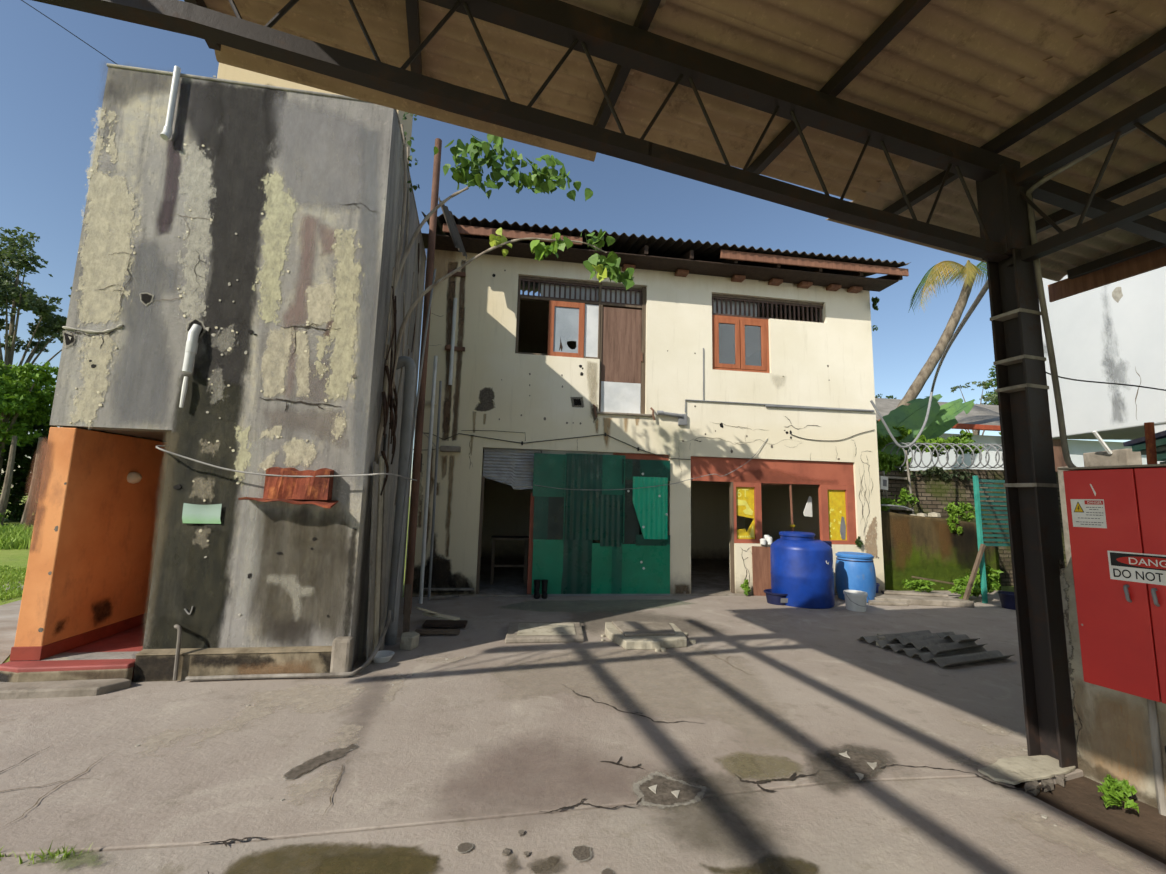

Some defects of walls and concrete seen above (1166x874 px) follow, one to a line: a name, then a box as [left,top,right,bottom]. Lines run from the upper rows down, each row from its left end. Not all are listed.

peeling [63,107,142,425]
peeling [176,138,248,356]
peeling [252,171,365,441]
rust [284,216,335,336]
damp [75,71,377,682]
peeling [190,477,215,502]
peeling [200,425,317,484]
crack [562,684,696,723]
crack [0,745,115,825]